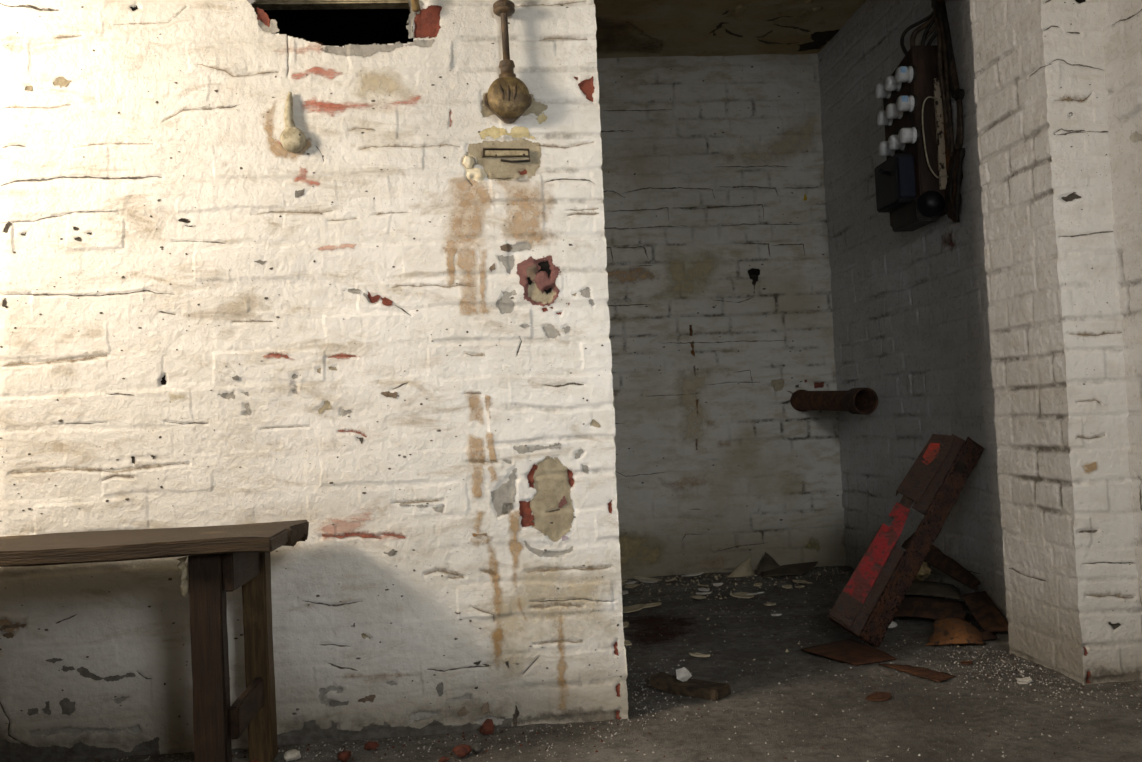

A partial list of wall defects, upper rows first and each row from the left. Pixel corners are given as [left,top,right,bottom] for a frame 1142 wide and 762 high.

spalling [247,0,442,58]
flaking render [797,29,840,51]
spalling [489,241,595,314]
peeling [520,324,570,338]
peeling [491,443,561,521]
water stain [619,534,660,565]
crack [1088,592,1134,600]